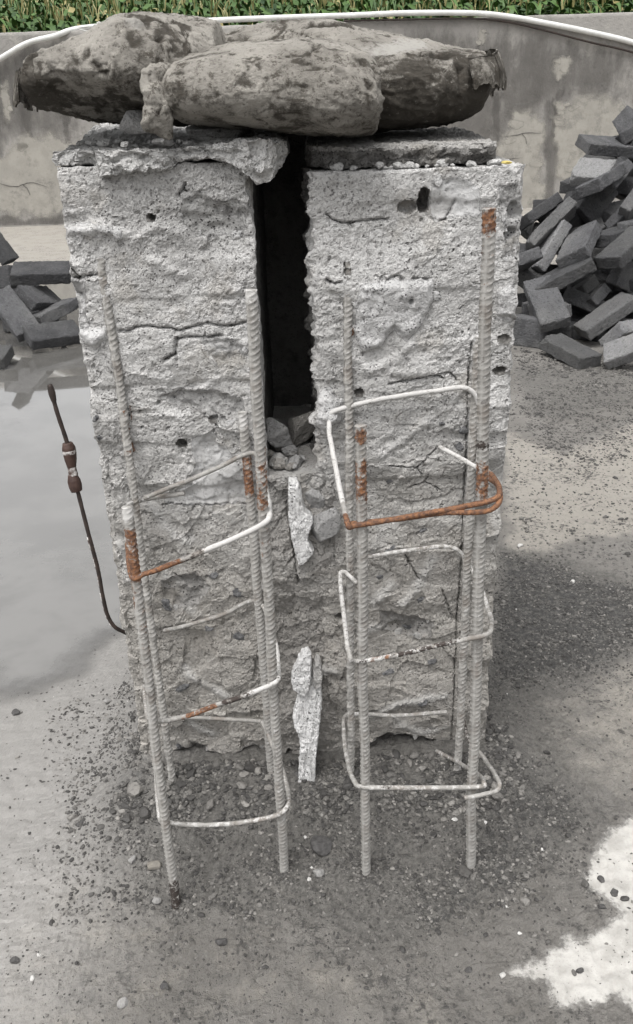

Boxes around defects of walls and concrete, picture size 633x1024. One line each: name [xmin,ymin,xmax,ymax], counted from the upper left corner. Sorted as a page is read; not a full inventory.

crack [120,321,247,361]